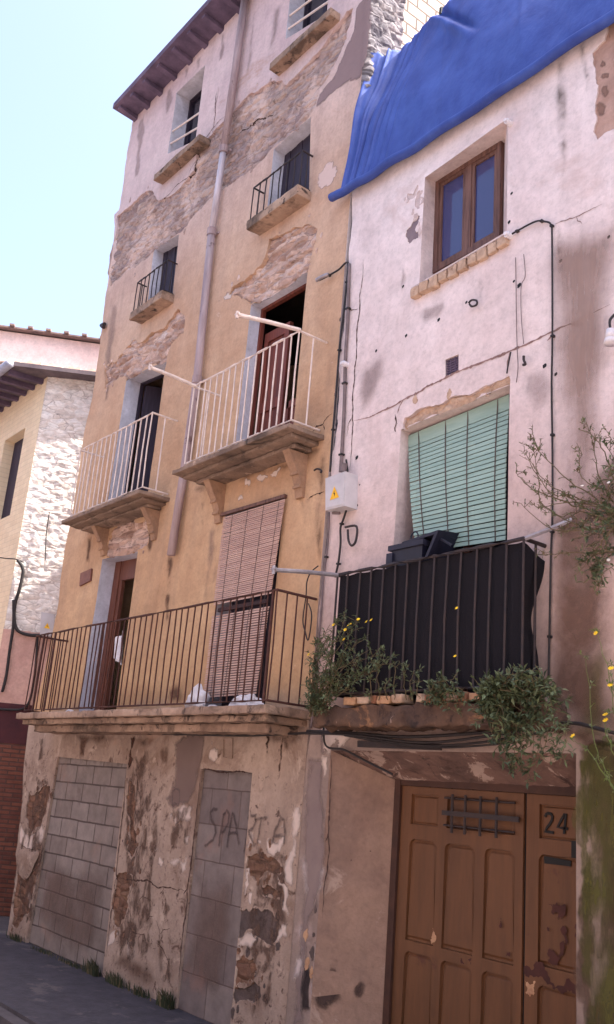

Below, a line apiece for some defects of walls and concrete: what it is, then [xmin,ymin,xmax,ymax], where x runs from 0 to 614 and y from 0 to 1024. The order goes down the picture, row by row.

flaking render [593,23,614,140]
flaking render [108,8,353,286]
flaking render [226,213,323,304]
flaking render [403,185,424,244]
flaking render [104,309,185,392]
crack [313,277,567,473]
flaking render [25,780,52,838]
flaking render [11,856,42,931]
flaking render [111,780,142,957]
crack [106,768,248,978]
flaking render [231,826,288,1020]